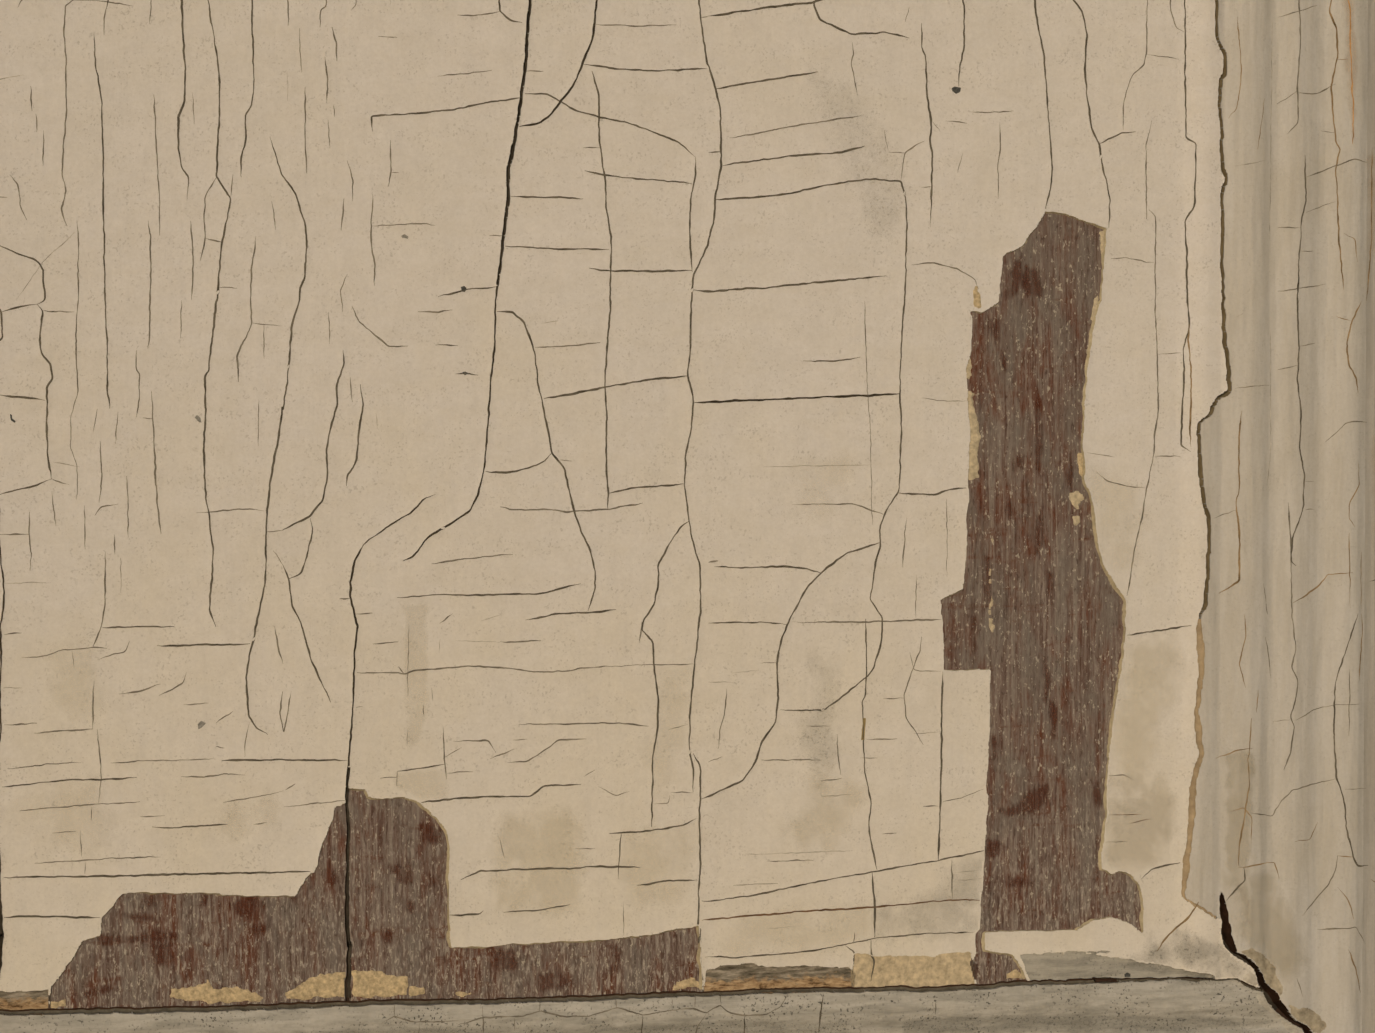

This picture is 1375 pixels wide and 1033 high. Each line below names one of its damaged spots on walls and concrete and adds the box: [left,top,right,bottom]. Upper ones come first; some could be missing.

crack [157,0,364,749]
crack [341,161,430,286]
peeling [0,212,1216,1016]
crack [365,0,984,964]
crack [995,132,1003,193]
crack [1034,0,1053,209]